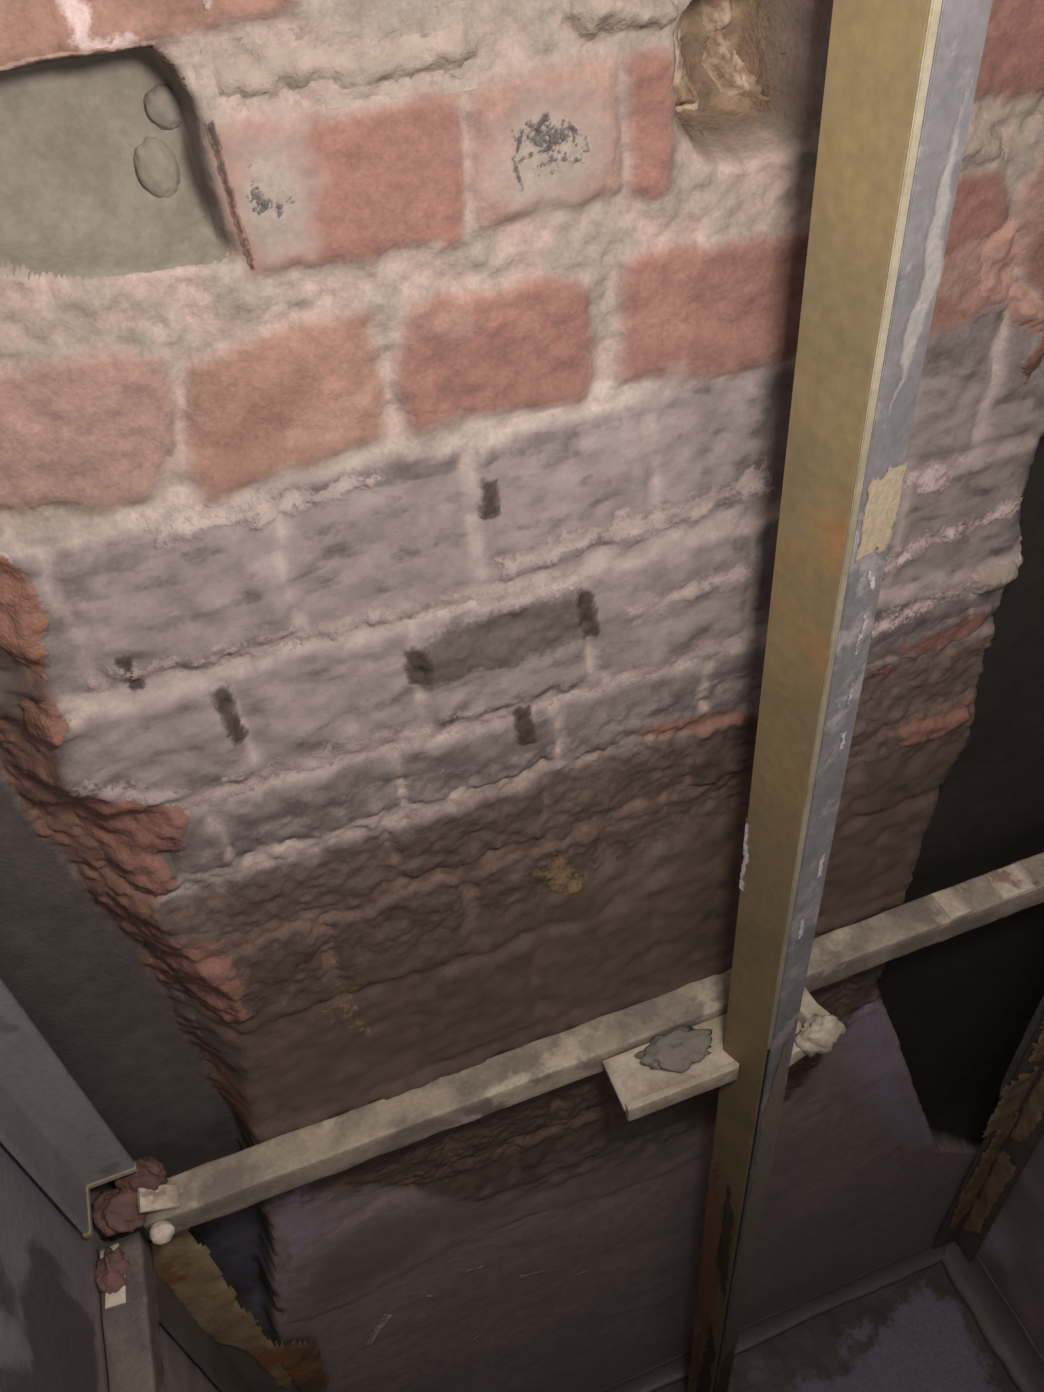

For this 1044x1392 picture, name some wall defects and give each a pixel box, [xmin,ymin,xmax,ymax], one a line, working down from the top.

damp [44,0,146,52]
spalling [673,0,786,142]
spalling [0,47,232,281]
spalling [1019,326,1044,384]
spalling [0,552,51,683]
spalling [18,698,70,747]
spalling [62,792,190,895]
spalling [143,924,259,1026]
rust [948,1022,1044,1234]
damp [0,1218,104,1392]
rust [151,1228,329,1392]